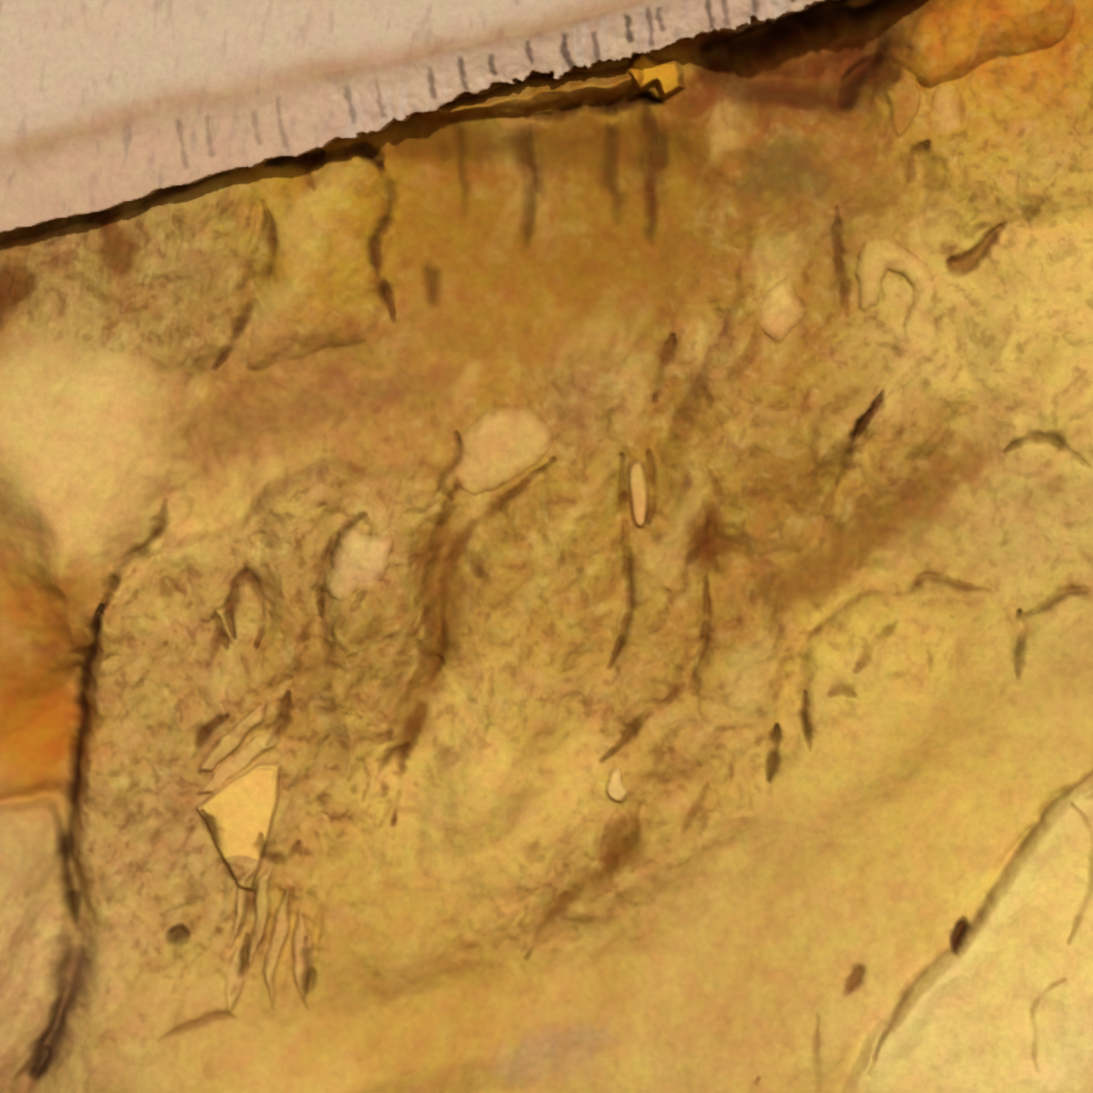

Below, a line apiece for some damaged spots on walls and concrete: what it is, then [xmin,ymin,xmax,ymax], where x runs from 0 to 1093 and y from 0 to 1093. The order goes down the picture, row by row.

water stain [641,108,667,234]
crack [137,517,164,553]
crack [69,574,118,804]
spalling [73,458,461,1017]
crack [396,719,418,758]
crack [60,834,78,920]